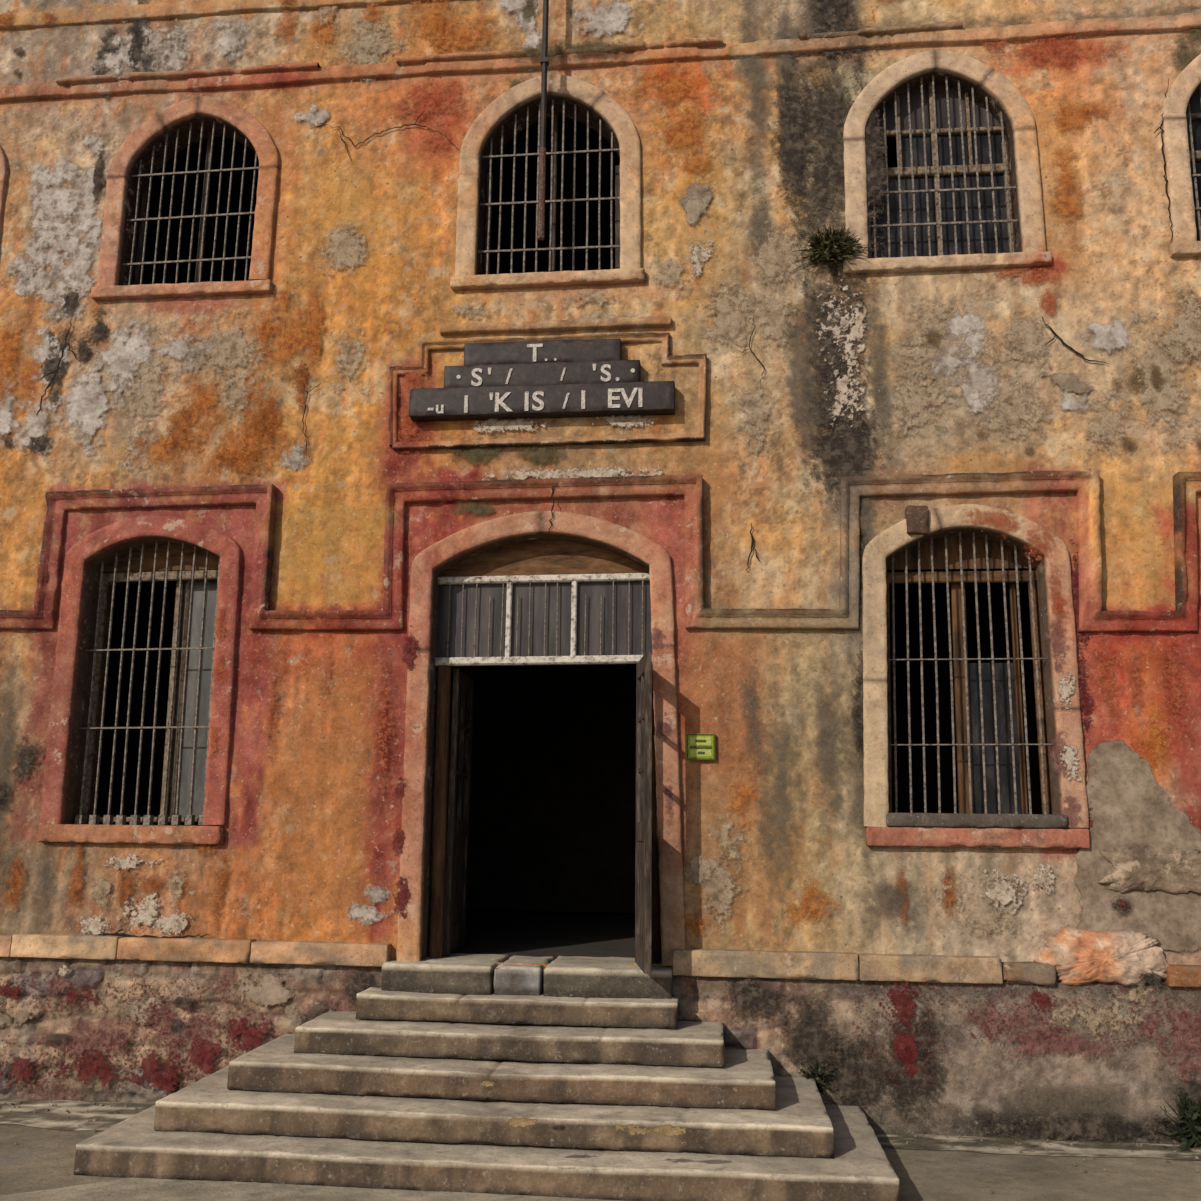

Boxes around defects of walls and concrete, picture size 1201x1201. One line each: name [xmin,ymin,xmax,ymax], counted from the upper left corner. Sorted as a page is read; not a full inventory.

peeling [572,0,643,38]
crack [317,111,460,162]
peeling [0,129,273,476]
leakage [738,0,900,505]
peeling [651,180,1201,463]
crack [1042,317,1108,364]
crack [548,485,556,533]
crack [746,524,760,570]
leakage [849,497,886,637]
leakage [0,709,44,889]
peeling [69,853,193,935]
flaking render [1049,732,1201,952]